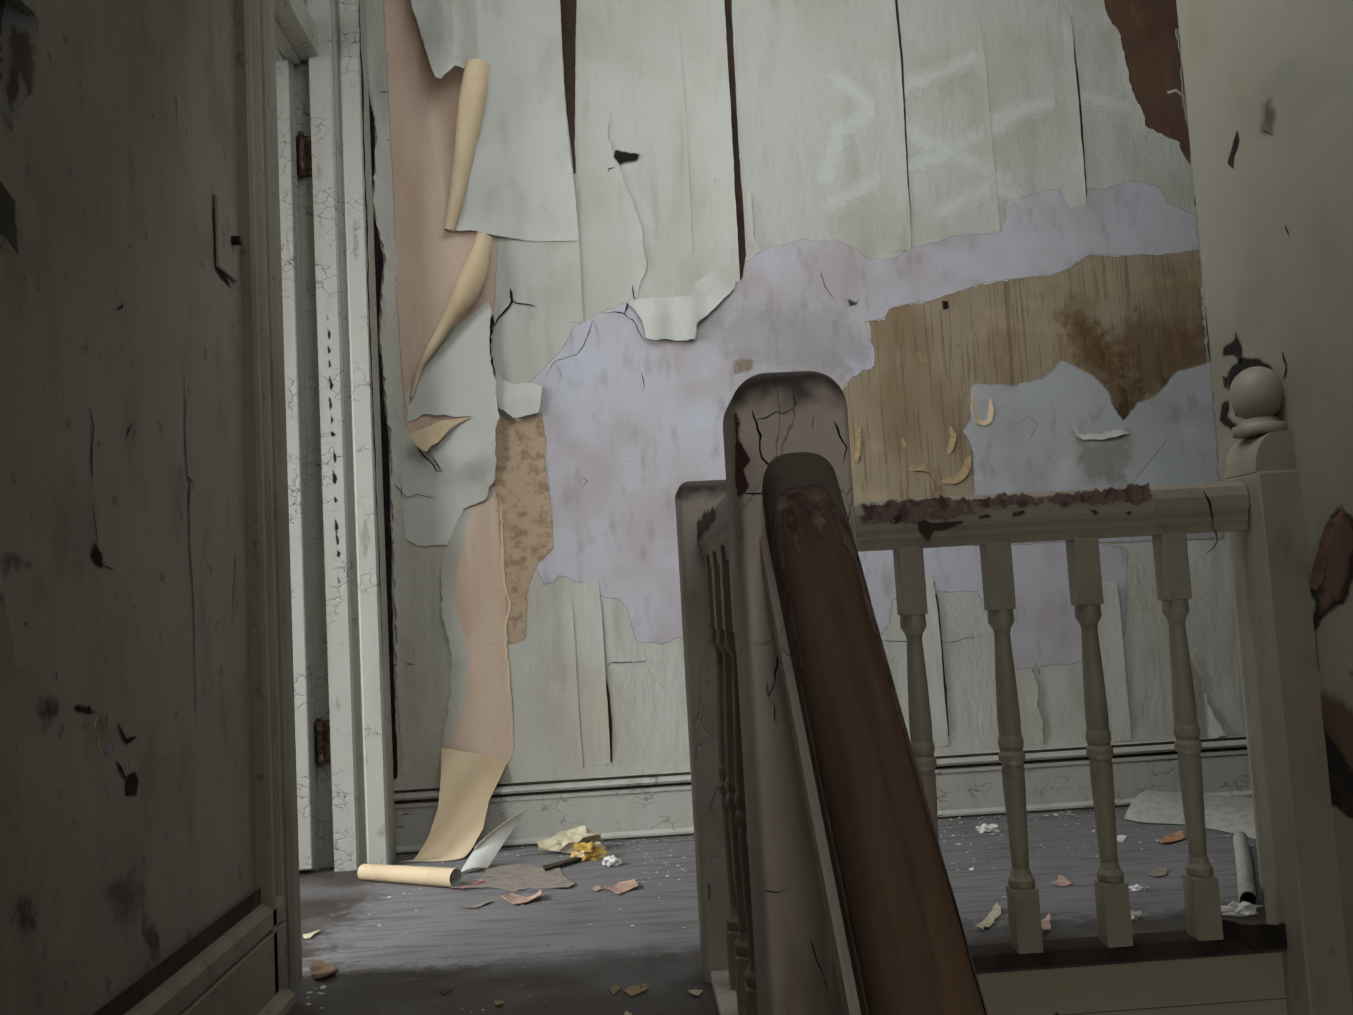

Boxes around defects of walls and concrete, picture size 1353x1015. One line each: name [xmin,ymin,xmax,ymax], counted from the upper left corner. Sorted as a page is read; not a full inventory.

peeling [0,0,38,129]
peeling [1104,0,1192,164]
peeling [0,181,18,254]
crack [545,101,647,378]
crack [742,189,759,253]
peeling [492,181,1199,742]
damp [843,250,1206,502]
peeling [860,306,1271,525]
spalling [1310,510,1353,664]
spalling [74,705,139,796]
peeling [357,747,527,888]
spalling [1320,694,1353,818]